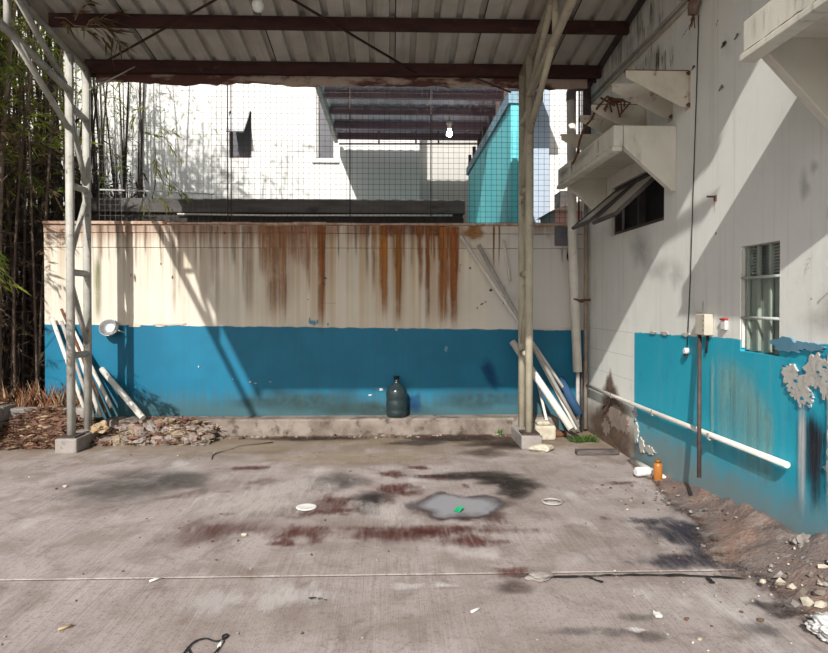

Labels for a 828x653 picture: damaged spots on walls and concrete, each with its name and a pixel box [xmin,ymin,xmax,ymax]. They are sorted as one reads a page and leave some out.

rust [260,226,325,315]
rust [363,226,482,313]
peeling [768,336,828,409]
spalling [602,404,656,455]